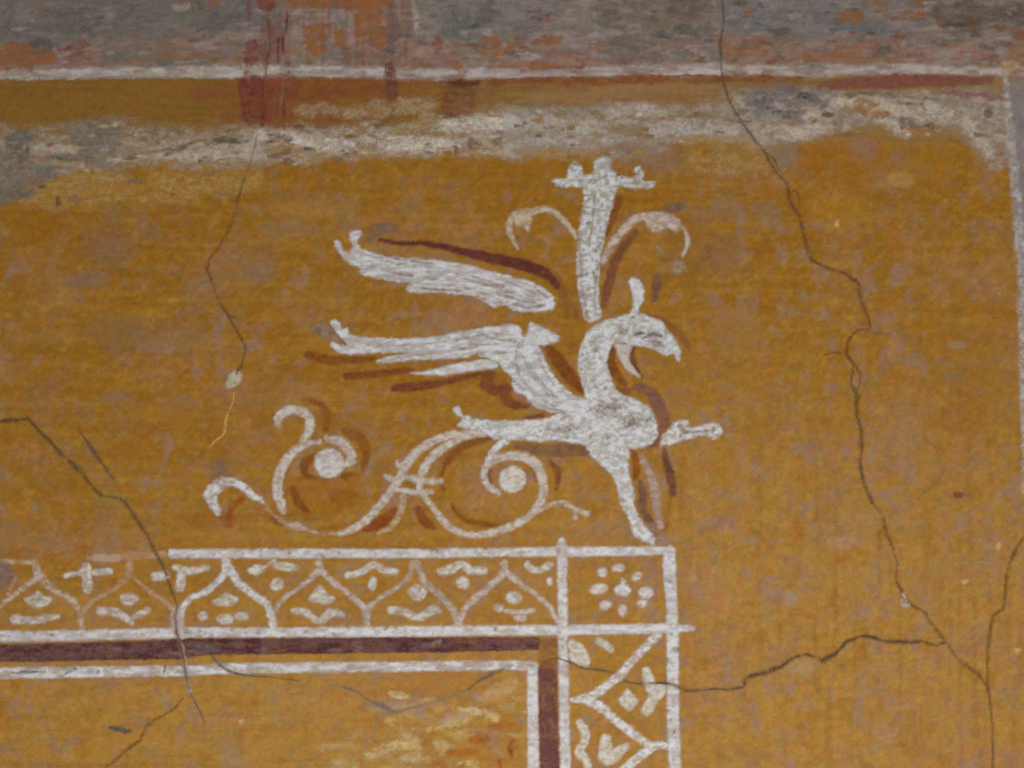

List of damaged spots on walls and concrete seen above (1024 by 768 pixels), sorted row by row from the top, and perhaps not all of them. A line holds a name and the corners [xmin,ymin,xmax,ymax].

crack [188,21,271,464]
crack [0,415,513,768]
peeling [235,83,1020,181]
crack [540,0,1024,768]